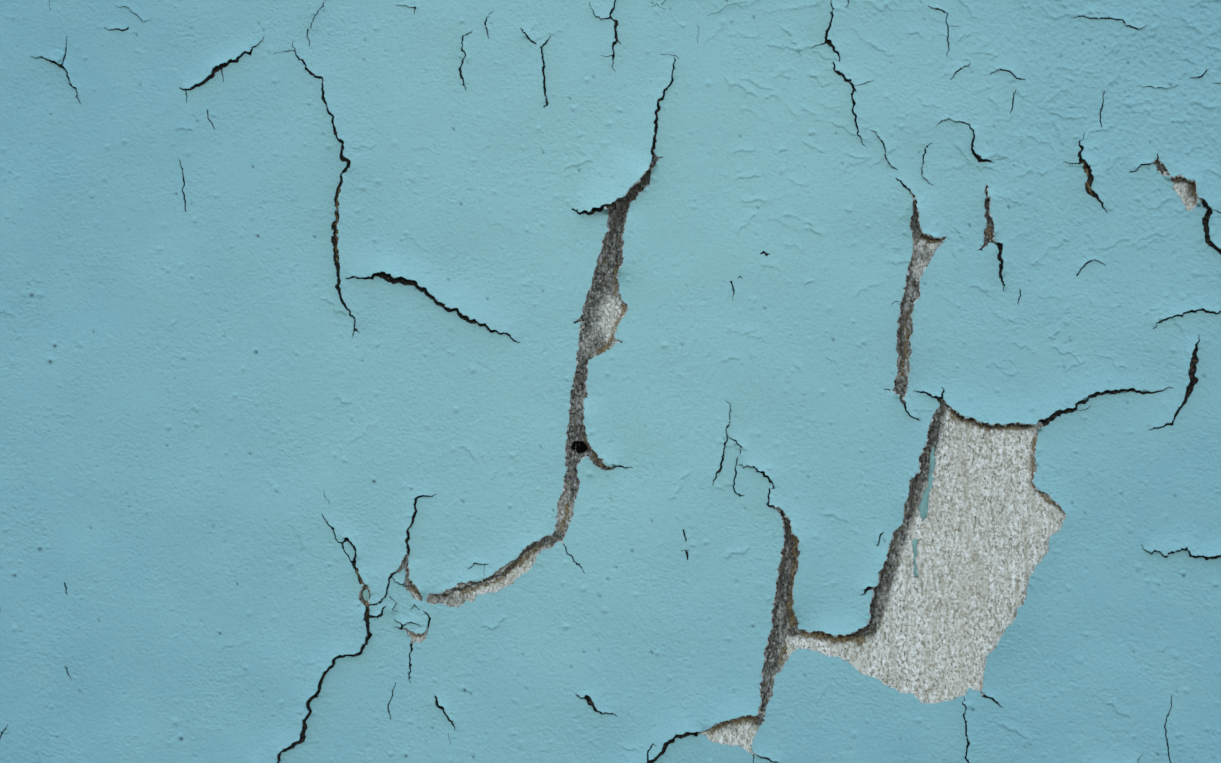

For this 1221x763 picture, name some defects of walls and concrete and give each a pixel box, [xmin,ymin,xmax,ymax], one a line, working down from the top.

crack [520,25,551,107]
crack [811,0,876,146]
crack [178,158,186,212]
crack [180,1,530,343]
peeling [1129,148,1221,255]
peeling [359,54,678,683]
crack [1149,309,1221,430]
peeling [611,130,1172,763]
crack [1141,530,1221,560]
crack [233,477,437,763]
crack [962,698,970,763]